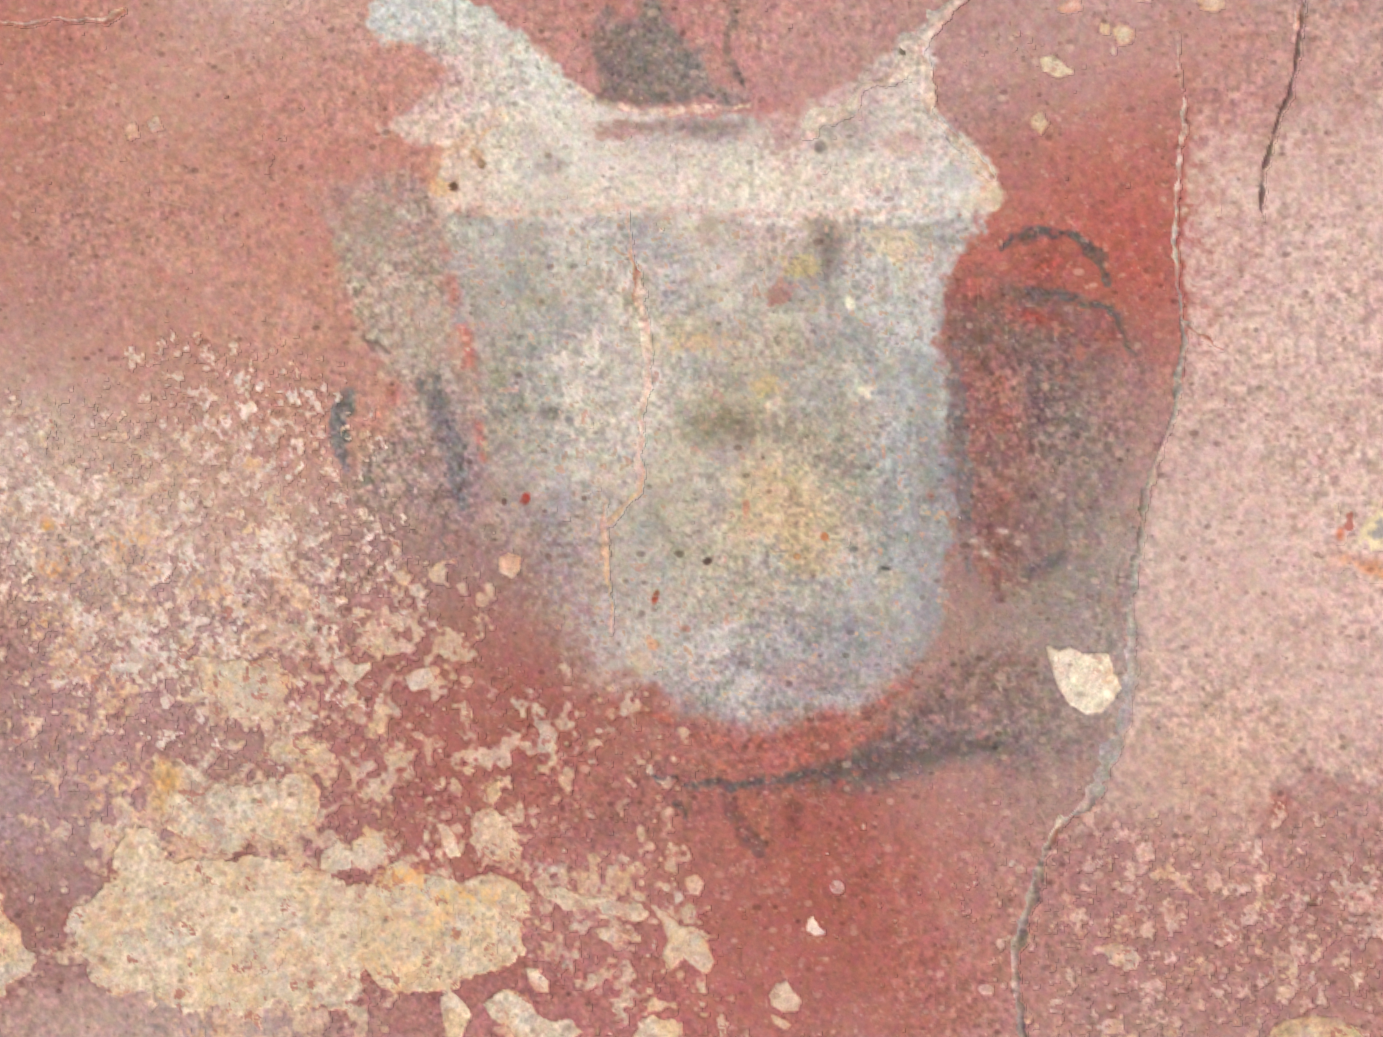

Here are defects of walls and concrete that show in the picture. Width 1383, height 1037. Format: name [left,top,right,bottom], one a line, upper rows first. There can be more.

crack [0,6,127,28]
crack [798,0,997,181]
crack [1257,0,1307,223]
leakage [0,369,343,625]
crack [1008,29,1226,1037]
peeling [0,319,751,1037]
flaking render [1045,644,1121,715]
flaking render [805,914,843,940]
peeling [829,878,845,896]
peeling [917,759,1383,1037]